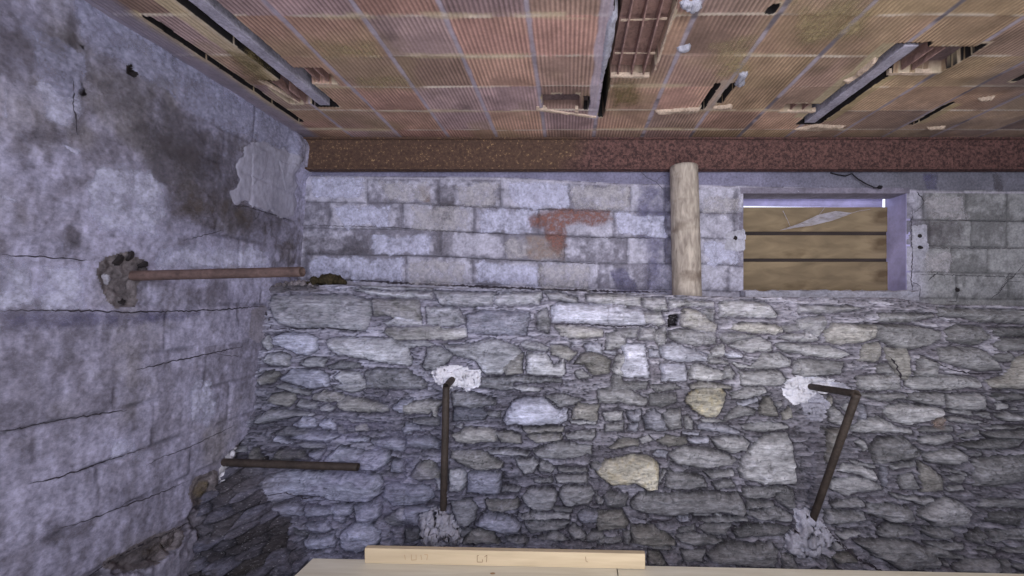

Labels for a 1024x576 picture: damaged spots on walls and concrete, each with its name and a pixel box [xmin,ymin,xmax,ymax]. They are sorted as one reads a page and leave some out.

crack [70,81,78,132]
flaking render [75,0,303,218]
rust [527,209,610,258]
crack [4,306,357,331]
crack [137,346,243,370]
crack [4,410,127,431]
crack [30,427,231,484]
crack [59,481,187,529]